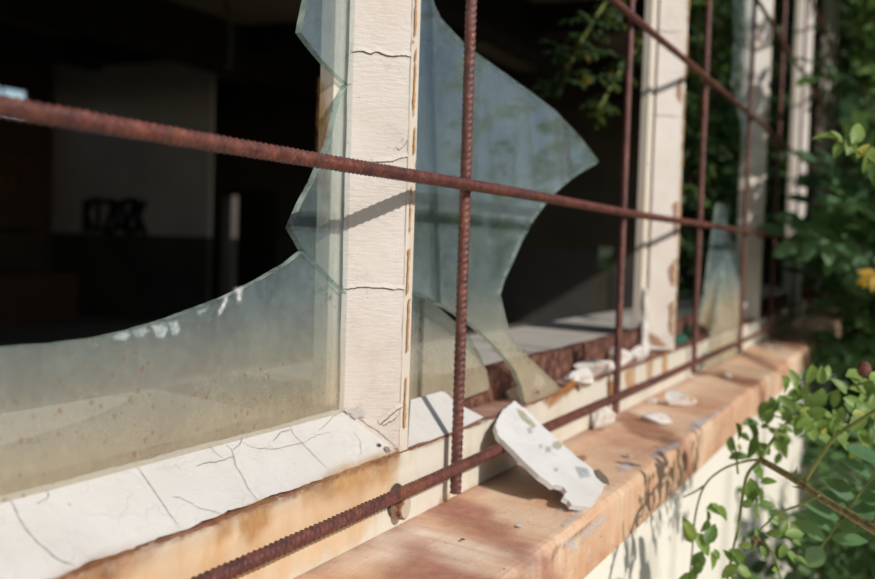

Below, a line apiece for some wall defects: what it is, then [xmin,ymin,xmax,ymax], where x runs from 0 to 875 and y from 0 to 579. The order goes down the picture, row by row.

crack [352,46,411,57]
crack [372,136,408,163]
corrosion [470,379,576,418]
crack [196,402,404,502]
crack [8,498,74,565]
crack [140,470,222,518]
corrosion [114,454,400,579]